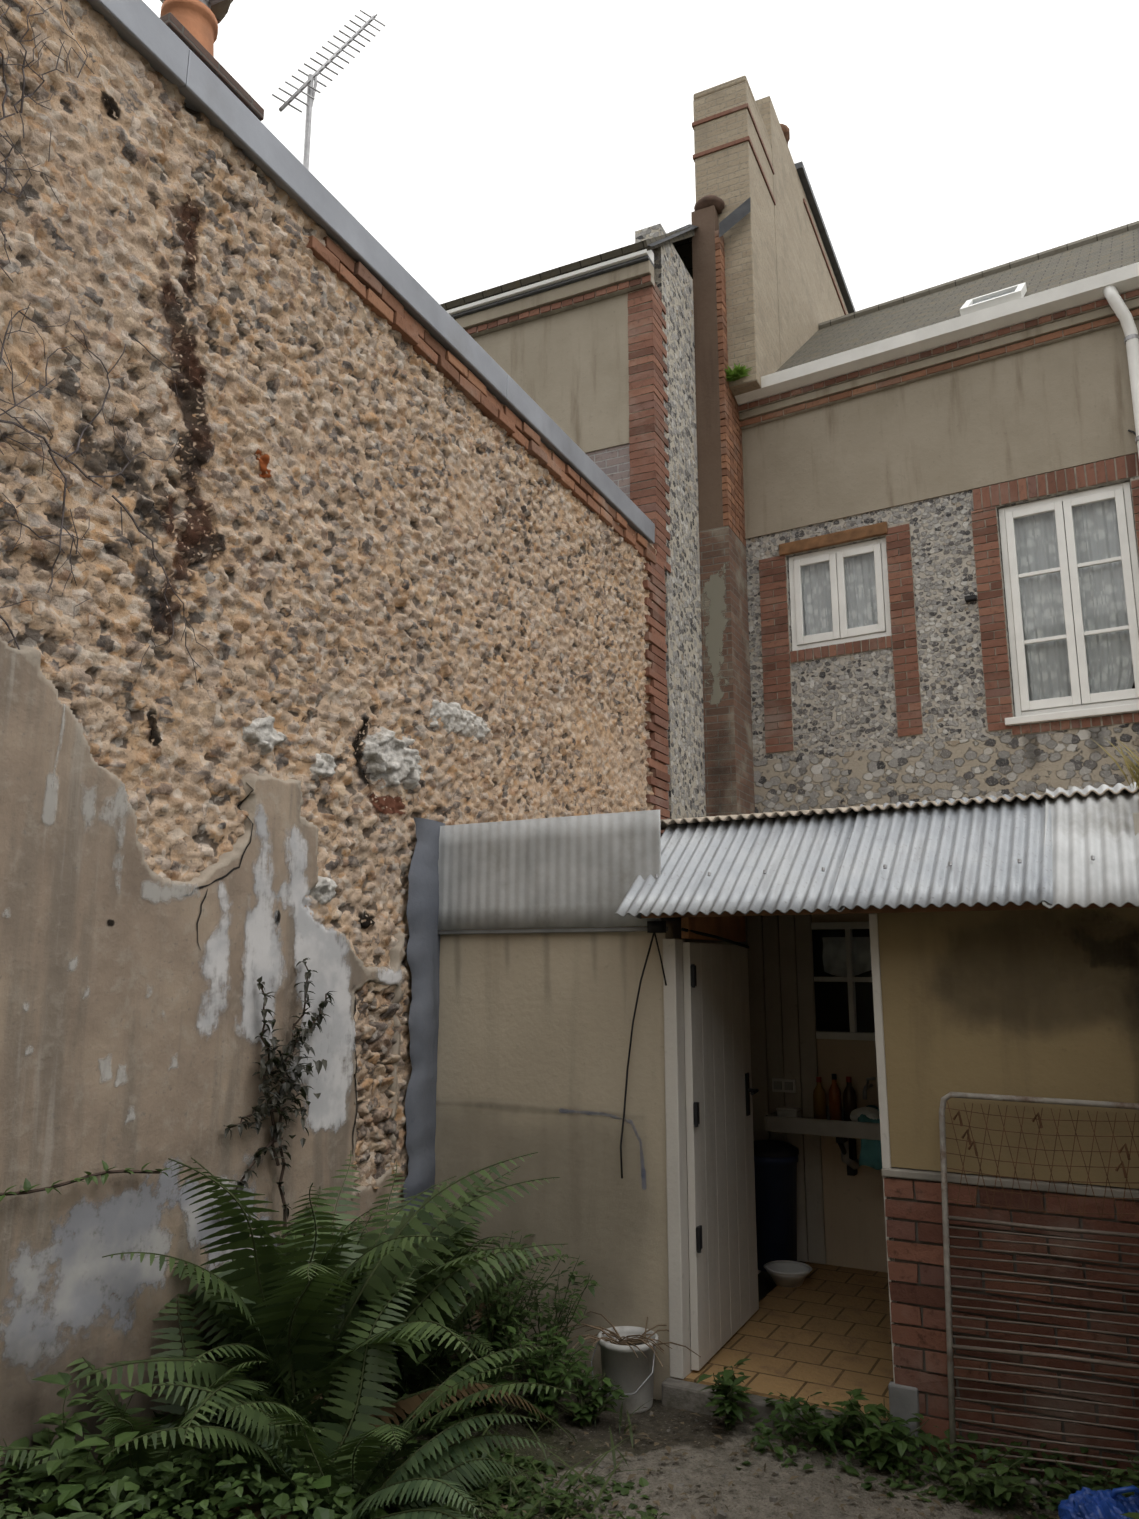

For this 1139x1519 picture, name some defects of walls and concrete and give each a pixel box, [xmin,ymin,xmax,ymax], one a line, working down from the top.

spalling [146,708,162,746]
peeling [100,1057,126,1087]
peeling [197,805,403,1199]
peeling [0,1156,277,1376]